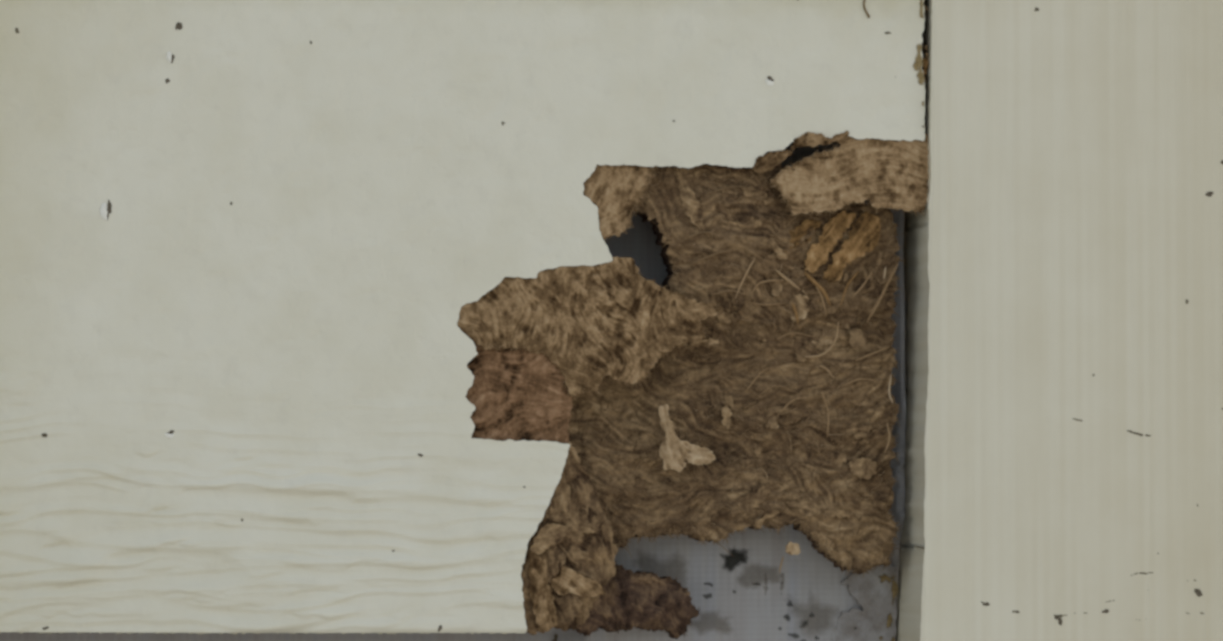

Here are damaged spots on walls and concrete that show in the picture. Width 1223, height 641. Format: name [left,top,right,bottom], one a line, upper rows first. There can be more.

peeling [753,131,851,173]
peeling [678,185,703,224]
peeling [804,210,881,282]
peeling [788,290,812,322]
peeling [848,329,869,347]
peeling [721,405,732,429]
peeling [848,458,877,480]
peeling [528,472,606,632]
peeling [785,541,800,555]